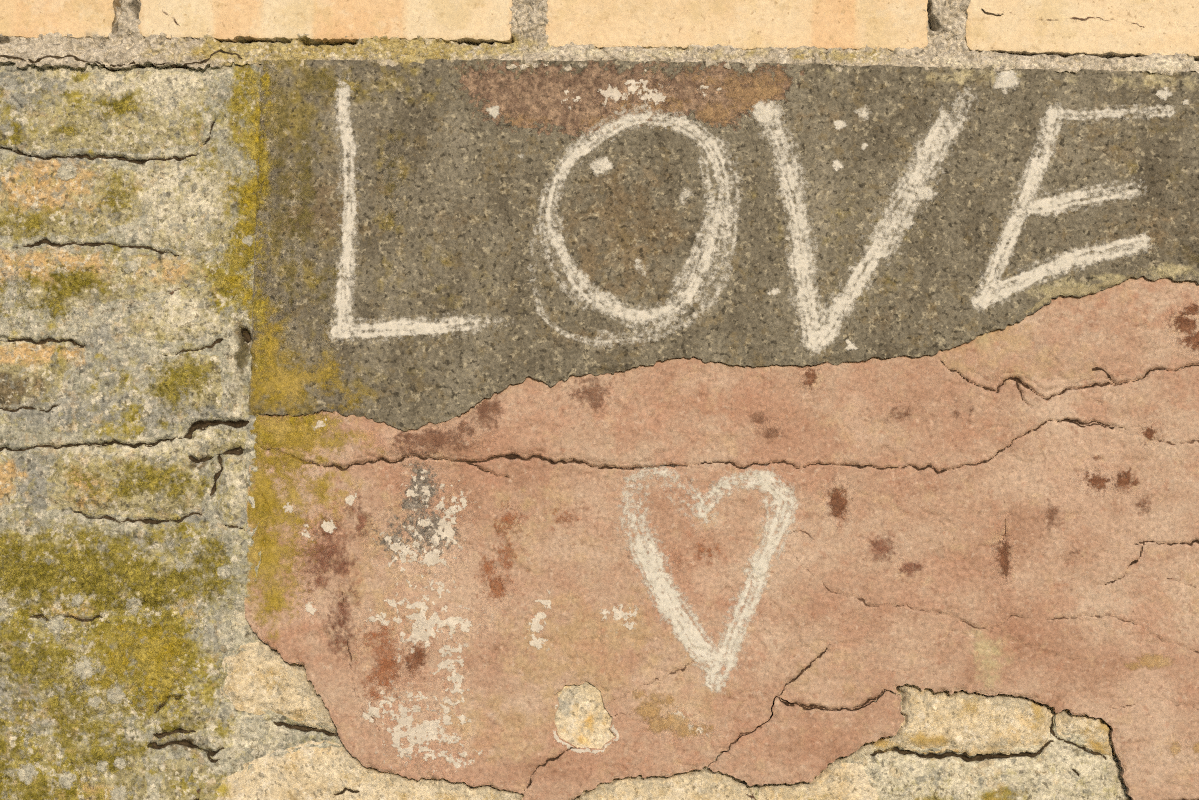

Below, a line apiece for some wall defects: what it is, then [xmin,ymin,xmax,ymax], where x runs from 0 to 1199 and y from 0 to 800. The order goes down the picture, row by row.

spalling [455,60,804,141]
crack [0,338,86,348]
crack [0,361,1199,531]
crack [1105,540,1199,585]
damp [362,574,483,773]
crack [779,644,887,711]
crack [274,722,338,736]
spalling [553,681,619,754]
peeling [635,691,713,737]
spalling [829,685,1117,770]
crack [865,715,1106,776]
spalling [569,765,818,800]